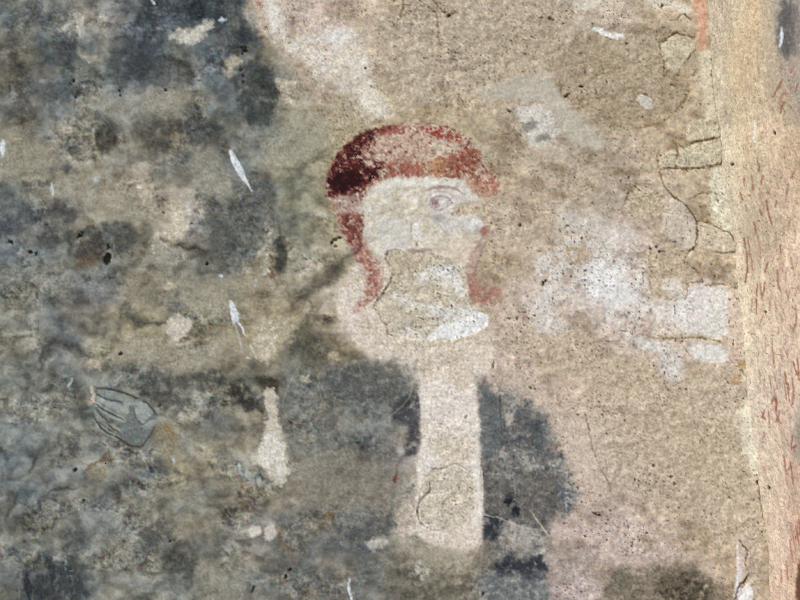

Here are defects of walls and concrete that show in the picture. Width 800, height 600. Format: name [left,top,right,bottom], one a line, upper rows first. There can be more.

leakage [5,36,60,85]
leakage [63,0,200,131]
leakage [0,212,23,237]
leakage [0,252,100,302]
leakage [0,125,165,232]
leakage [55,256,277,386]
leakage [180,140,242,208]
crack [621,13,736,301]